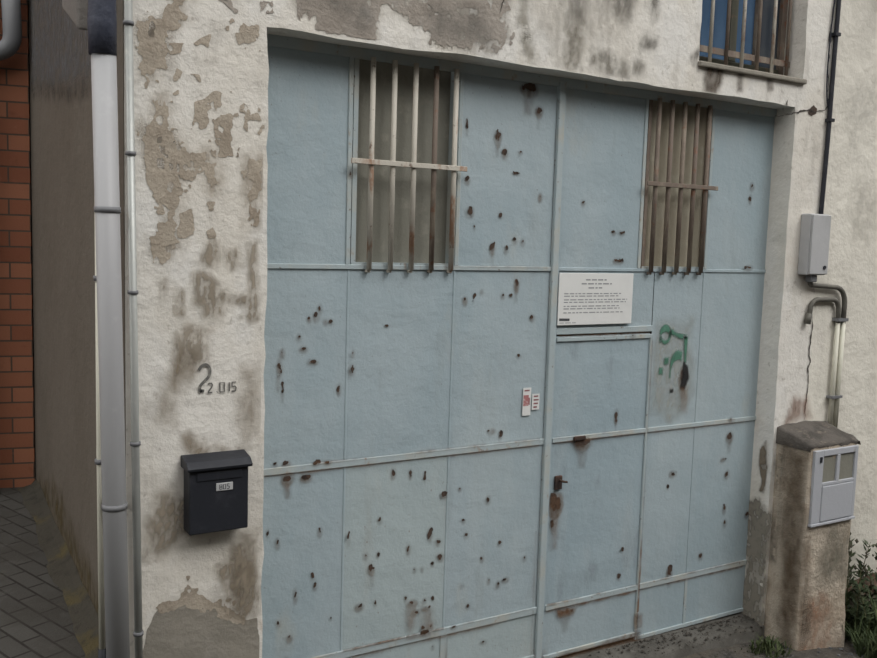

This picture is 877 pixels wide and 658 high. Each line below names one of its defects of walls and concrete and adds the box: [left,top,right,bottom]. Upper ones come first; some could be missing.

peeling [297,0,515,53]
corrosion [705,68,723,93]
peeling [134,0,265,320]
peeling [177,327,203,365]
corrosion [550,493,561,528]
peeling [143,545,259,658]
corrosion [352,624,440,649]